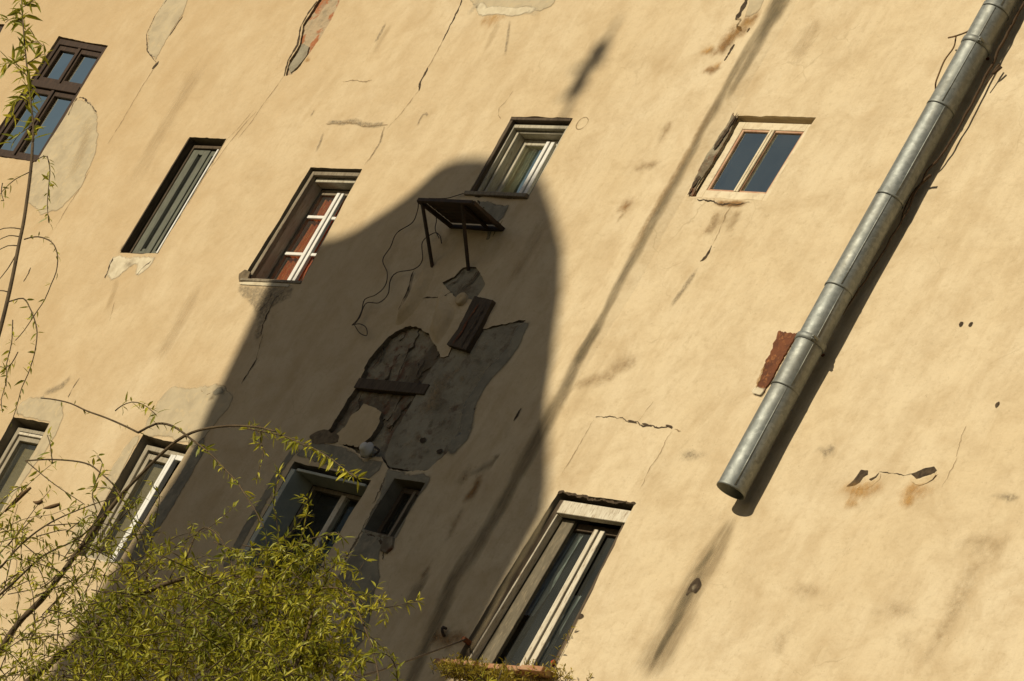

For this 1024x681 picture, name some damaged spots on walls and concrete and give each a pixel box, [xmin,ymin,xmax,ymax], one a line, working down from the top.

peeling [474,2,535,16]
flaking render [240,0,340,136]
crack [312,0,462,161]
flaking render [688,113,738,197]
flaking render [104,256,154,279]
flaking render [443,267,485,300]
crack [677,205,732,298]
flaking render [309,320,529,472]
crack [558,402,679,505]